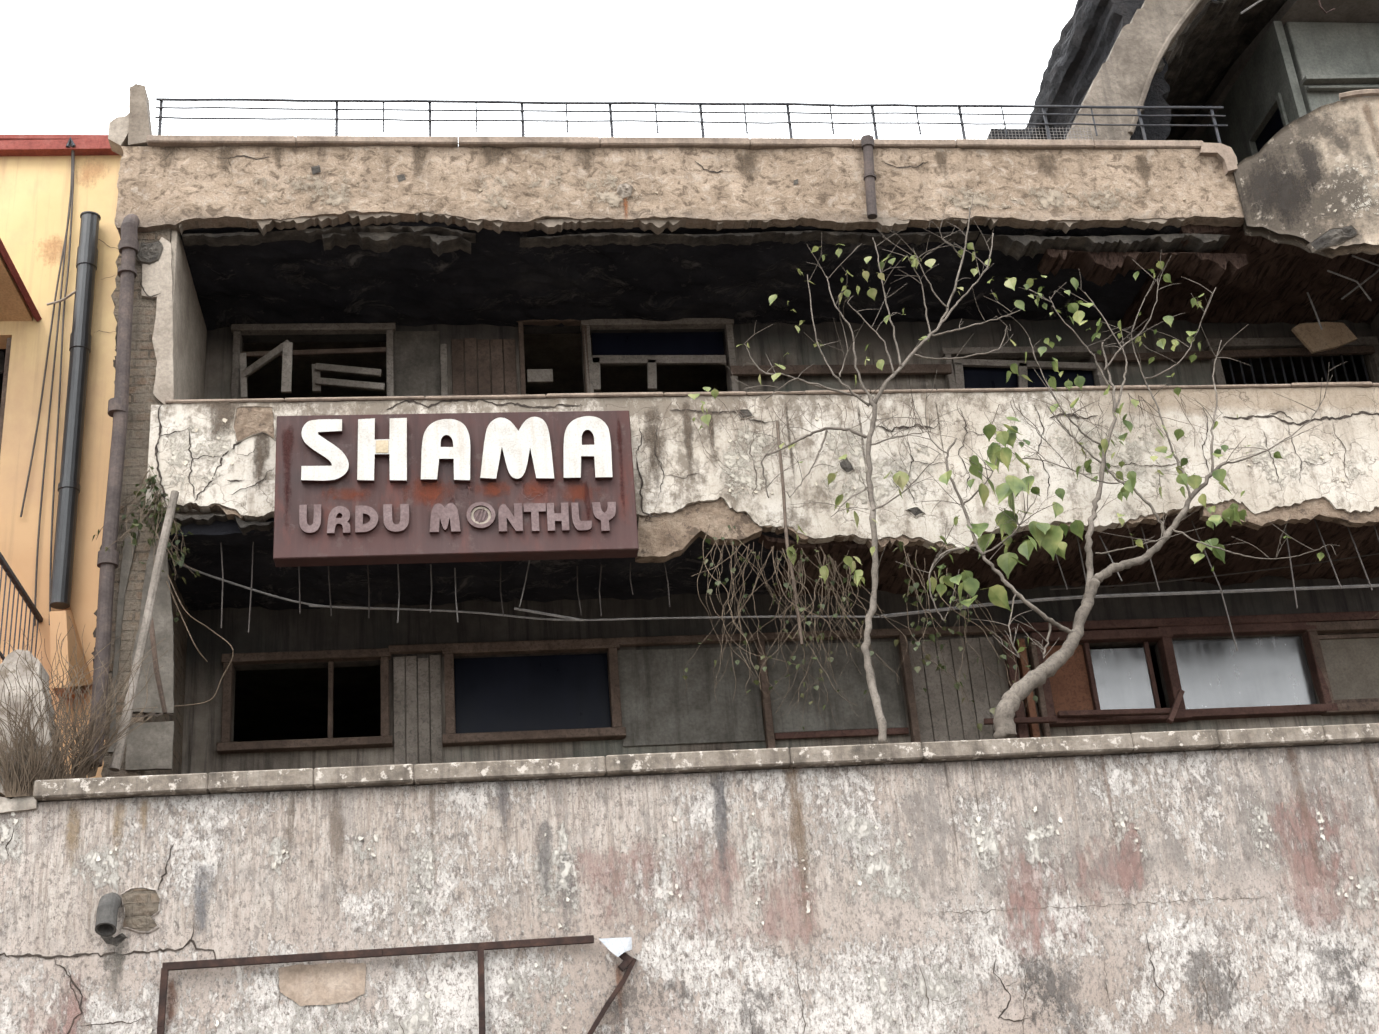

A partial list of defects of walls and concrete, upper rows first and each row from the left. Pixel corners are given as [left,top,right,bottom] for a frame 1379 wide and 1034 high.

crack [155,405,275,504]
peeling [1031,418,1189,494]
crack [1110,408,1379,498]
flaking render [629,409,1037,607]
flaking render [1058,435,1379,652]
flaking render [71,843,162,946]
crack [158,844,174,890]
crack [0,923,216,1034]
flaking render [183,962,473,1034]